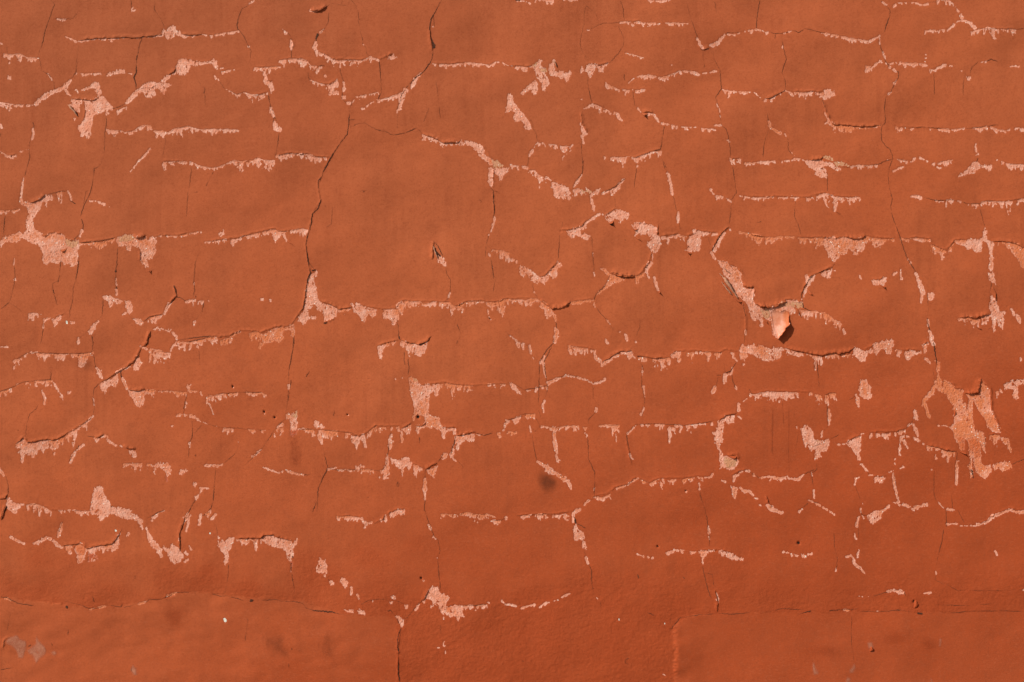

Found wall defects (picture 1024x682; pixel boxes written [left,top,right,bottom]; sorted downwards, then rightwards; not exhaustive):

crack [287,3,440,400]
peeling [0,1,881,506]
crack [710,55,737,260]
crack [879,1,936,346]
crack [538,336,555,413]
crack [711,363,737,394]
peeling [440,225,1024,612]
peeling [0,482,217,564]
peeling [316,557,376,615]
peeling [389,580,571,654]
crack [798,500,837,572]
crack [647,511,1020,629]